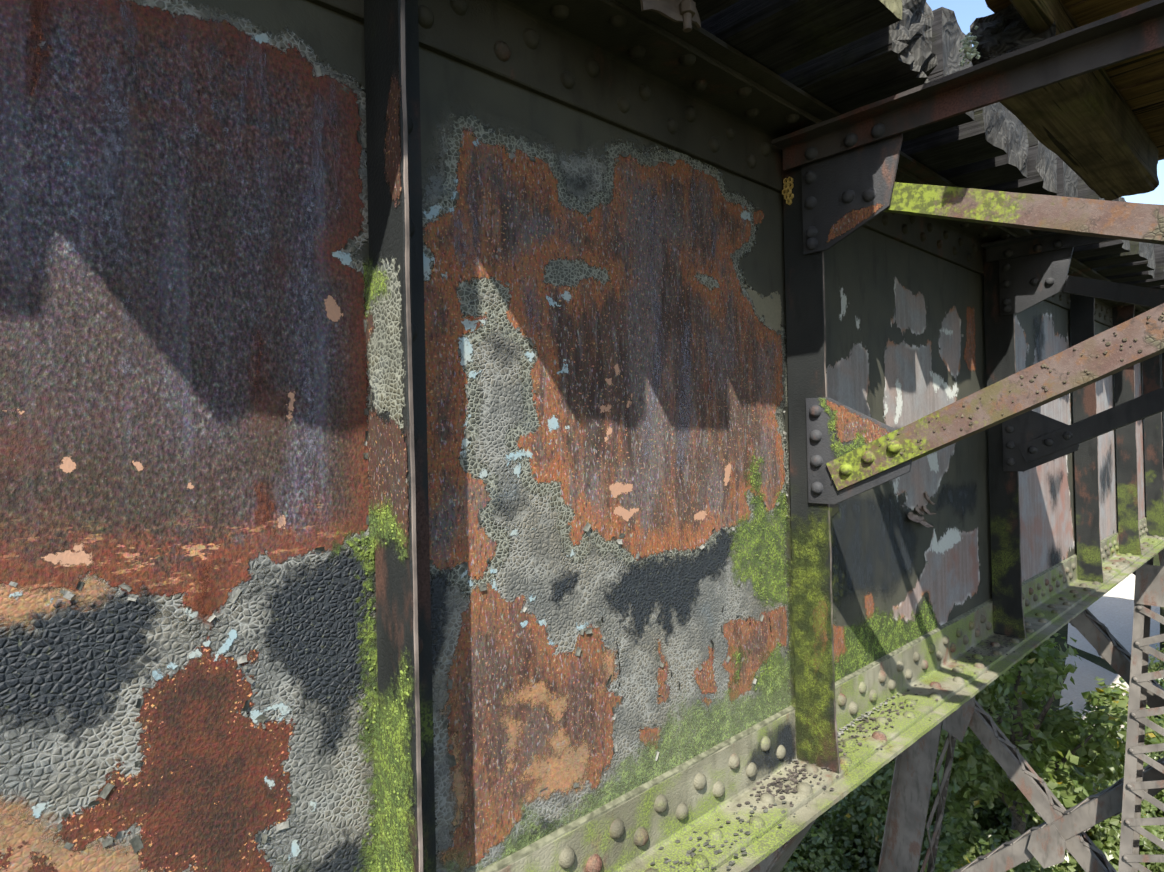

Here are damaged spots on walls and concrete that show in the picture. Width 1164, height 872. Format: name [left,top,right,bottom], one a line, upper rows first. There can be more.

corrosion [826,203,883,243]
peeling [458,318,486,379]
peeling [826,276,964,429]
corrosion [964,306,976,371]
peeling [1014,313,1069,373]
corrosion [0,0,409,872]
corrosion [827,400,891,444]
peeling [1032,394,1071,425]
corrosion [423,126,788,872]
peeling [891,443,981,625]
peeling [1019,455,1075,582]
peeling [152,629,237,681]